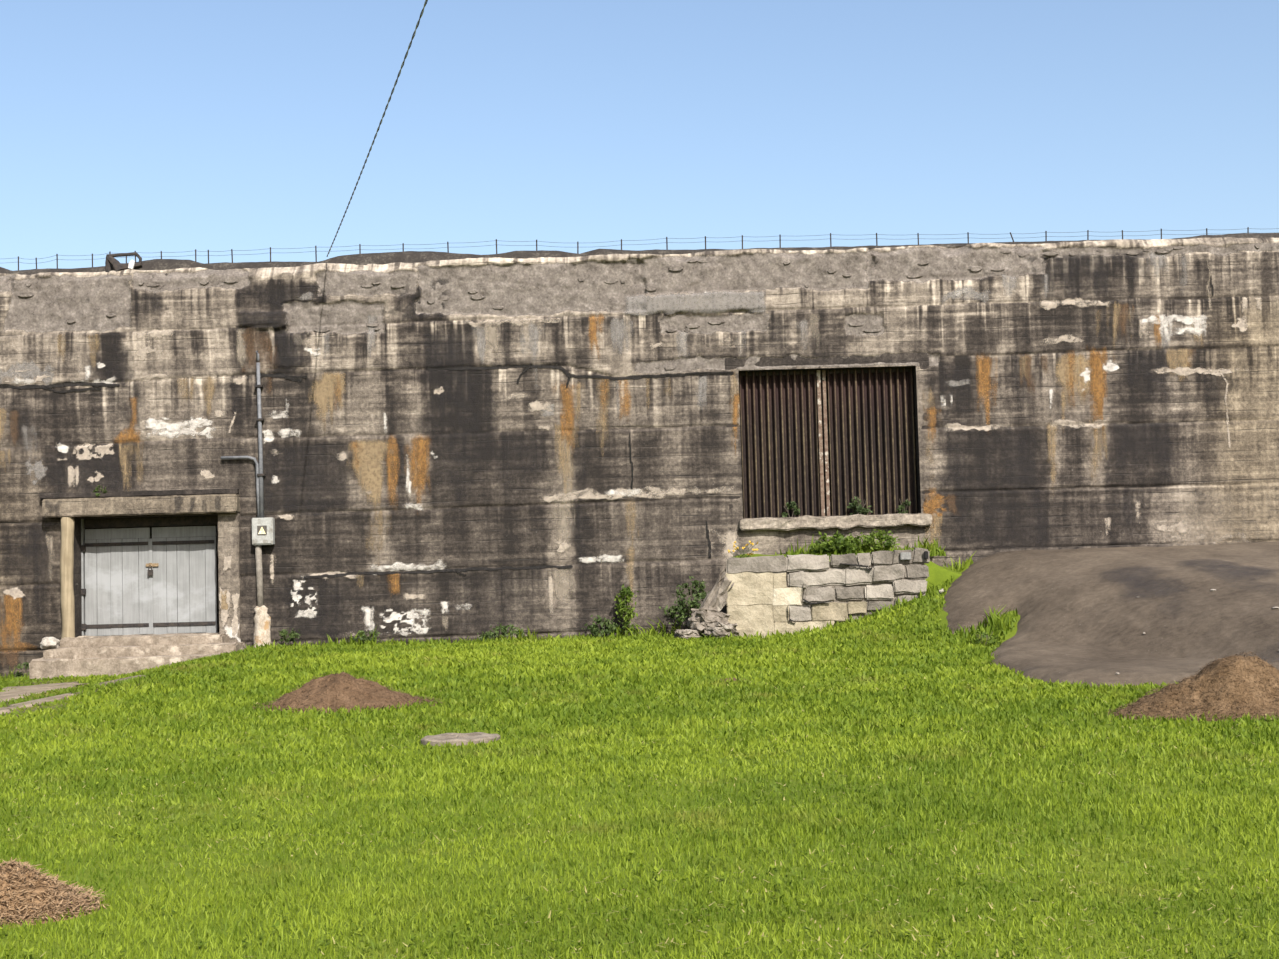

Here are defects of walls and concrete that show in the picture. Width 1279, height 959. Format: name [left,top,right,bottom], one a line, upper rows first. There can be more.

corrosion [1113,303,1189,379]
damp [1080,315,1232,383]
damp [146,410,236,438]
corrosion [978,358,990,423]
corrosion [1020,350,1107,477]
damp [26,443,126,491]
damp [263,406,300,520]
corrosion [351,437,429,531]
damp [544,464,729,552]
corrosion [0,594,29,667]
damp [291,571,356,618]
damp [362,593,470,636]